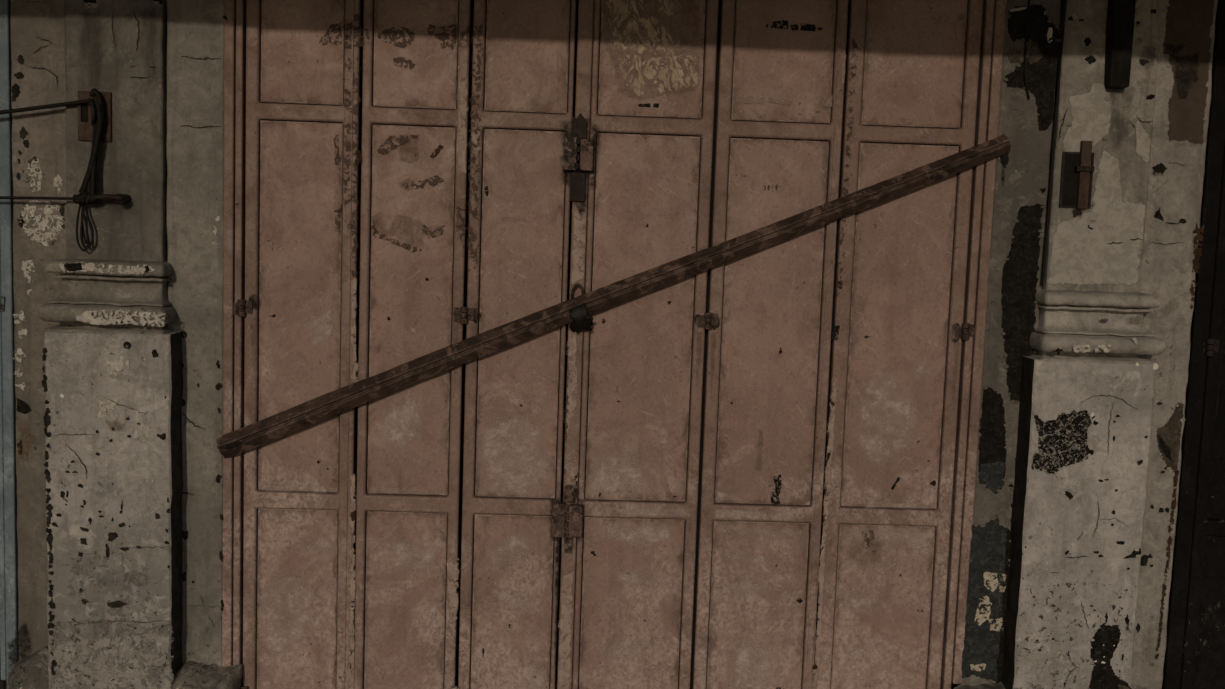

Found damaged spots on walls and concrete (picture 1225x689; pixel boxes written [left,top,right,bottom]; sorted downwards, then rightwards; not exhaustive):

peeling [11,55,24,102]
peeling [1146,0,1214,144]
peeling [16,127,65,246]
peeling [21,260,37,296]
peeling [58,262,155,275]
peeling [977,5,1167,494]
peeling [48,308,165,327]
flaking render [1157,402,1186,473]
peeling [13,311,208,689]
peeling [1116,541,1153,570]
peeling [962,504,1147,689]